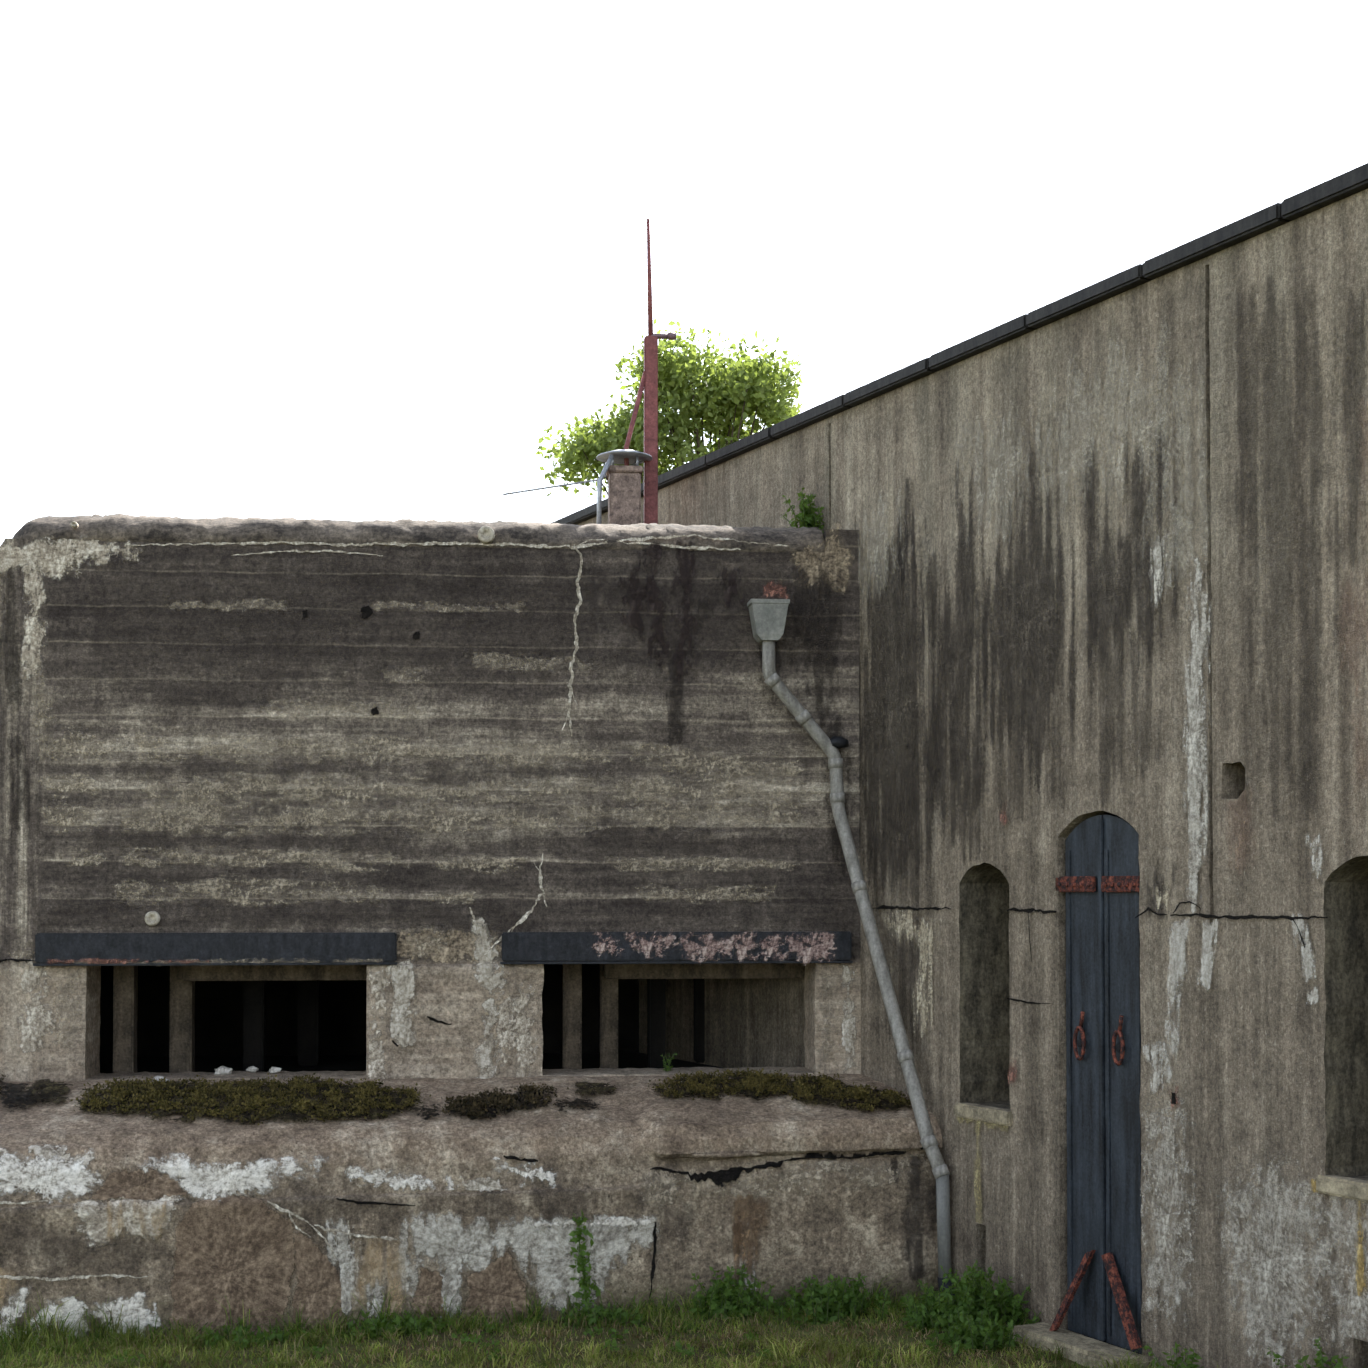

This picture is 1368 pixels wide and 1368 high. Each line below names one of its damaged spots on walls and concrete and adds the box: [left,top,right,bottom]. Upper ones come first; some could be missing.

crack [124,534,788,736]
damp [618,540,744,745]
damp [761,423,1218,1092]
damp [1308,835,1322,878]
crack [484,853,548,955]
peeling [592,930,837,965]
crack [872,904,951,912]
crack [1007,907,1057,961]
crack [1135,901,1328,948]
damp [1292,914,1318,1004]
crack [650,1147,923,1188]
spalling [0,1144,345,1343]